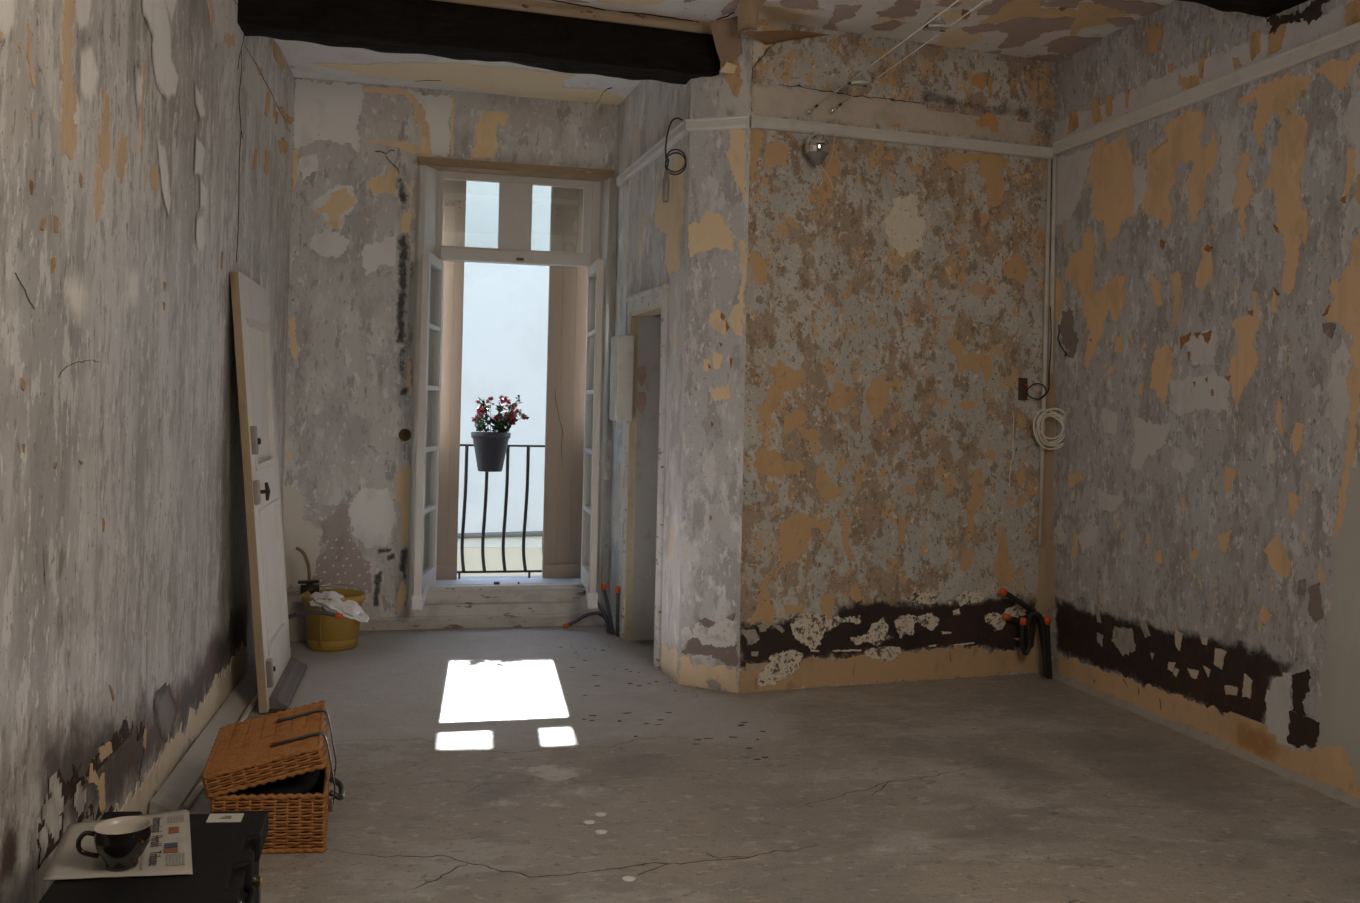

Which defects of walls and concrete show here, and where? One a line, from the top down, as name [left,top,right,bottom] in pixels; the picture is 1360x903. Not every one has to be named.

crack [234,0,296,262]
flaking render [309,165,413,276]
peeling [198,0,625,201]
crack [552,0,734,22]
peeling [654,148,768,337]
flaking render [726,0,1165,228]
flaking render [1054,0,1360,799]
flaking render [283,463,410,594]
flaking render [614,447,1035,693]
damp [0,582,251,903]
flaking render [37,641,249,869]
crack [332,845,816,890]